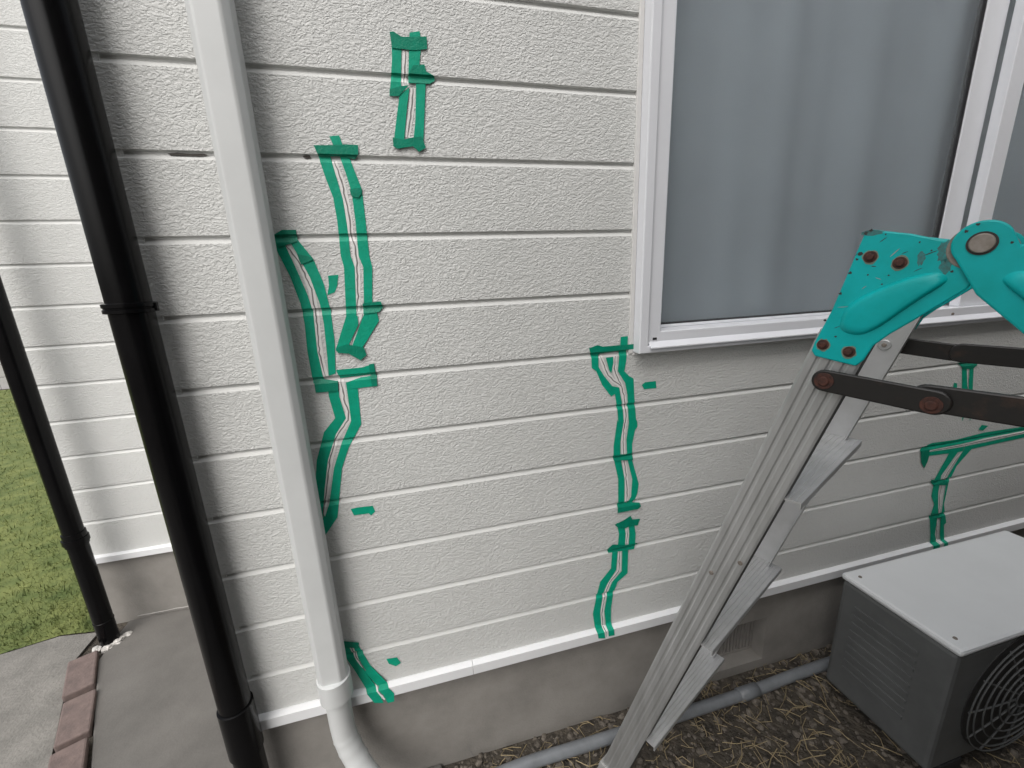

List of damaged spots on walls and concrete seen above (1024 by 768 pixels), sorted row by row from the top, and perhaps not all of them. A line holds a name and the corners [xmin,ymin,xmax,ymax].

crack [403,51,413,137]
crack [334,161,363,345]
crack [286,246,349,518]
crack [601,356,628,502]
crack [933,432,1024,544]
crack [602,533,628,632]